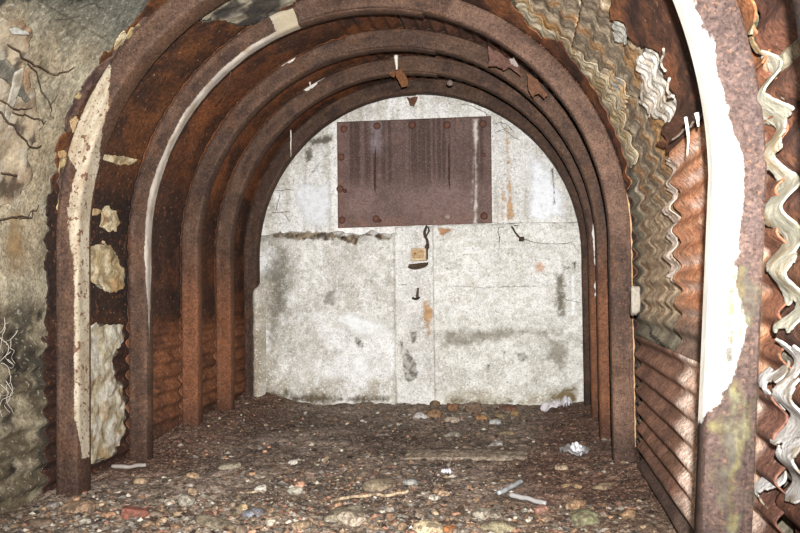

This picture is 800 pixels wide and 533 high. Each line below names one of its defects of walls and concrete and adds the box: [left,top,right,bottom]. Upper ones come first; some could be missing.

peeling [673,0,748,424]
peeling [67,64,126,464]
damp [270,261,285,322]
damp [337,313,384,336]
rust [423,302,432,334]